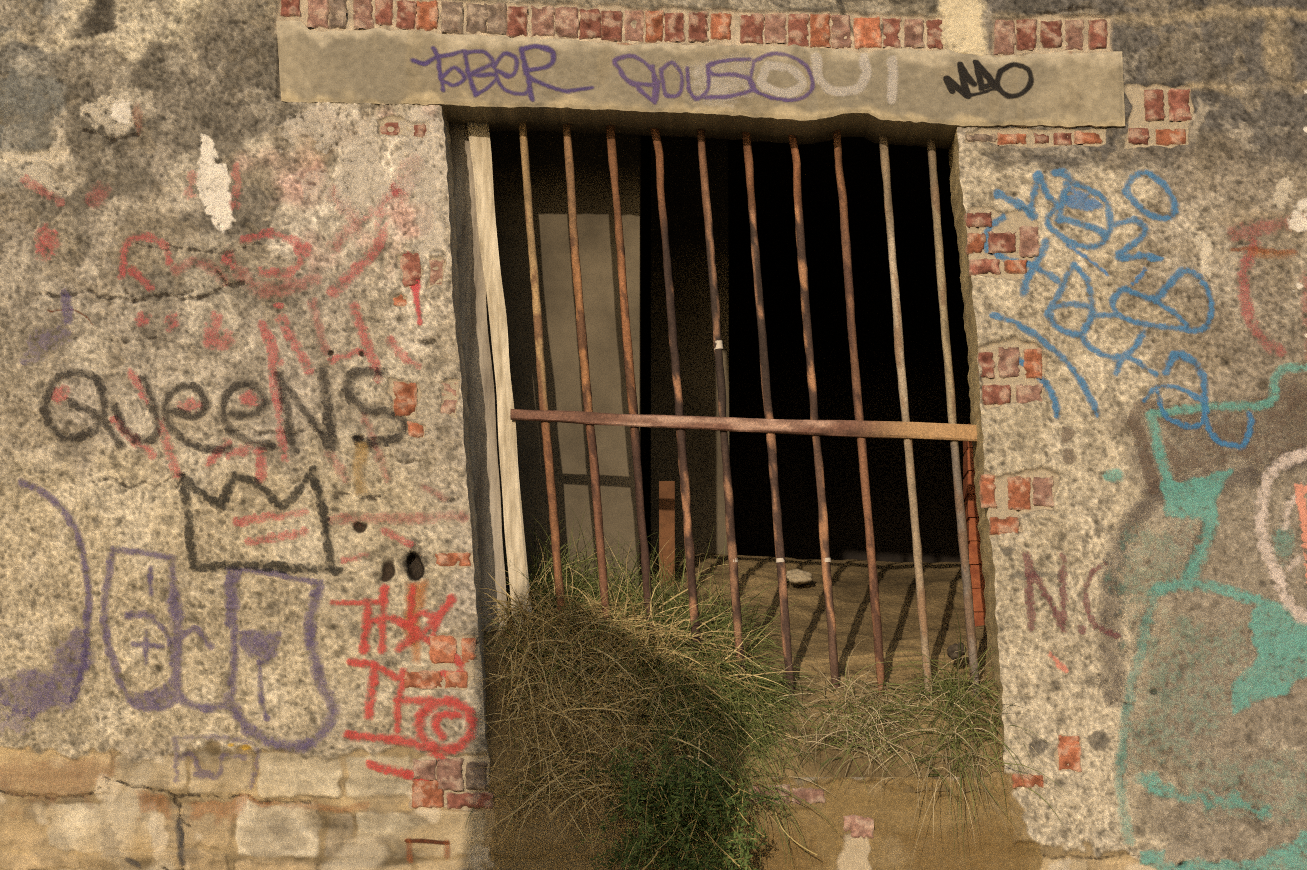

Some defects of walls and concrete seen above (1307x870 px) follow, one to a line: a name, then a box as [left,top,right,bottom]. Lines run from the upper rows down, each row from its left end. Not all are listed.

spalling [965,127,1106,148]
spalling [1124,84,1194,149]
peeling [196,134,236,233]
spalling [964,207,1040,280]
crack [35,242,259,343]
spalling [976,337,1047,410]
spalling [406,752,494,811]
crack [89,777,271,870]